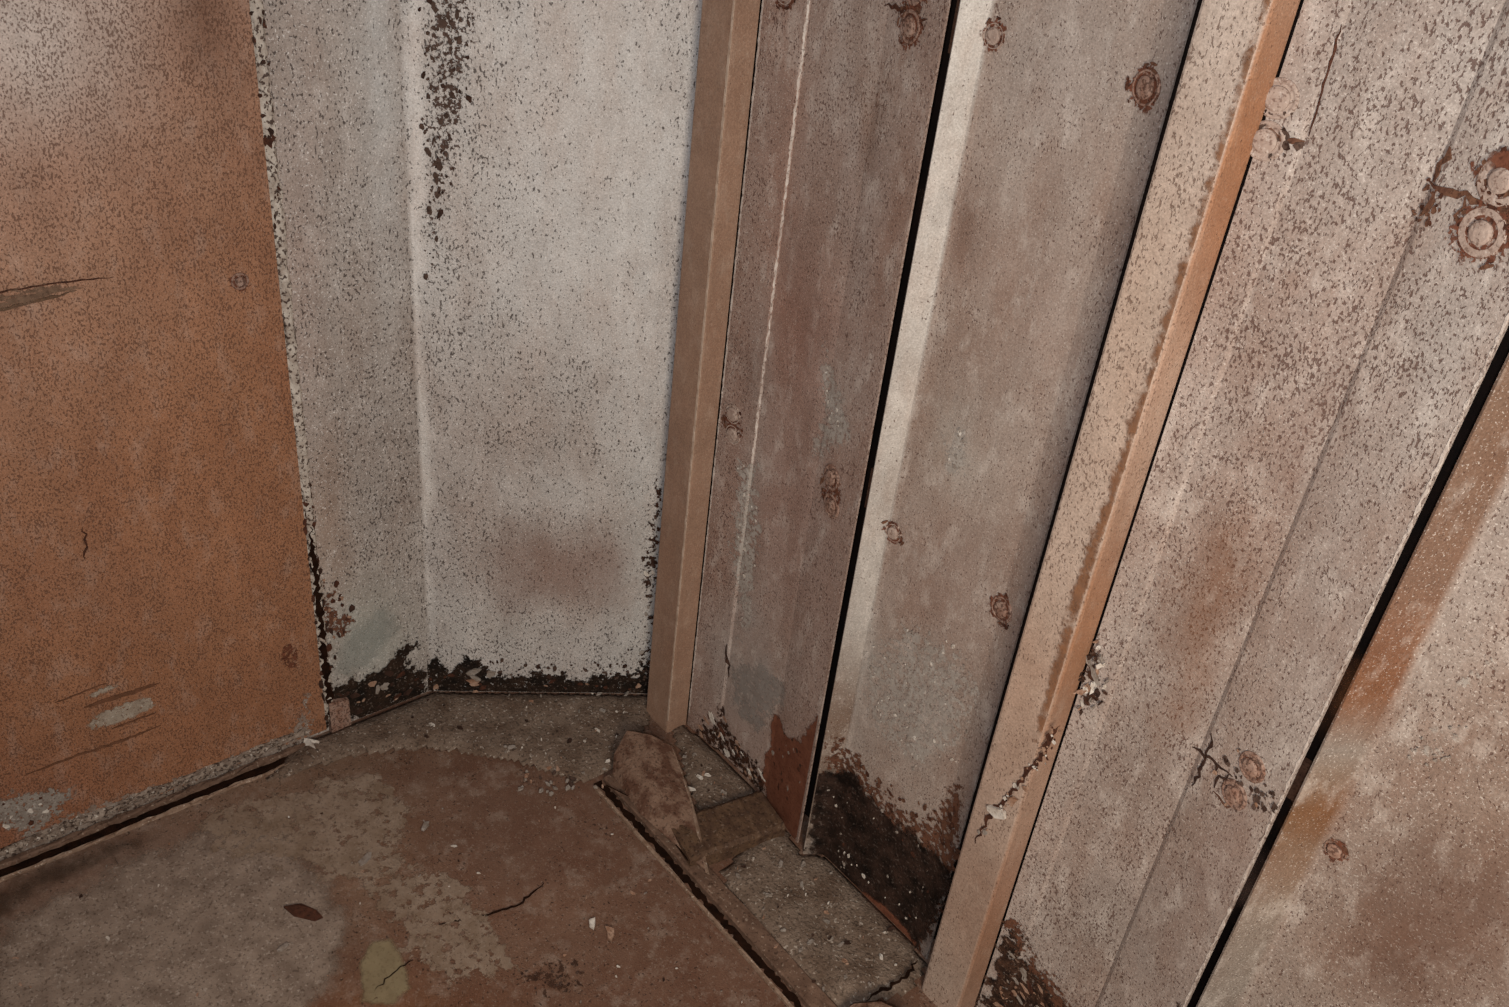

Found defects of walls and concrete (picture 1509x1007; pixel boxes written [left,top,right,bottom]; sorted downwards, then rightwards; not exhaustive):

rust [885,0,928,51]
rust [1445,146,1509,270]
rust [1038,45,1256,732]
water stain [55,683,159,708]
water stain [331,637,651,719]
peeling [0,787,74,837]
water stain [0,693,329,861]
rust [762,714,966,877]
water stain [805,769,951,950]
rust [1212,749,1278,813]